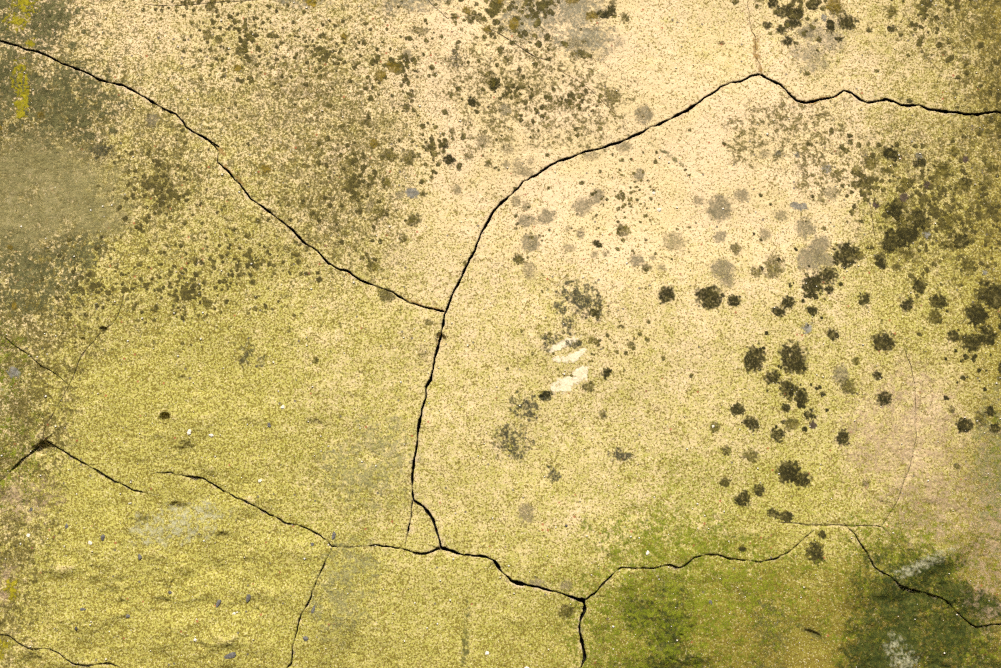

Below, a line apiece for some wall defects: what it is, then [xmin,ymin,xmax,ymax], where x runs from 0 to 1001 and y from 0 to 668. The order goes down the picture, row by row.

mould [768,0,834,52]
mould [887,0,978,63]
crack [0,41,388,291]
damp [141,0,659,261]
mould [834,84,1001,286]
crack [0,295,140,492]
damp [0,0,322,667]
crack [371,74,1001,667]
mould [777,365,826,417]
mould [945,332,989,391]
crack [158,472,349,668]
damp [838,547,1001,668]